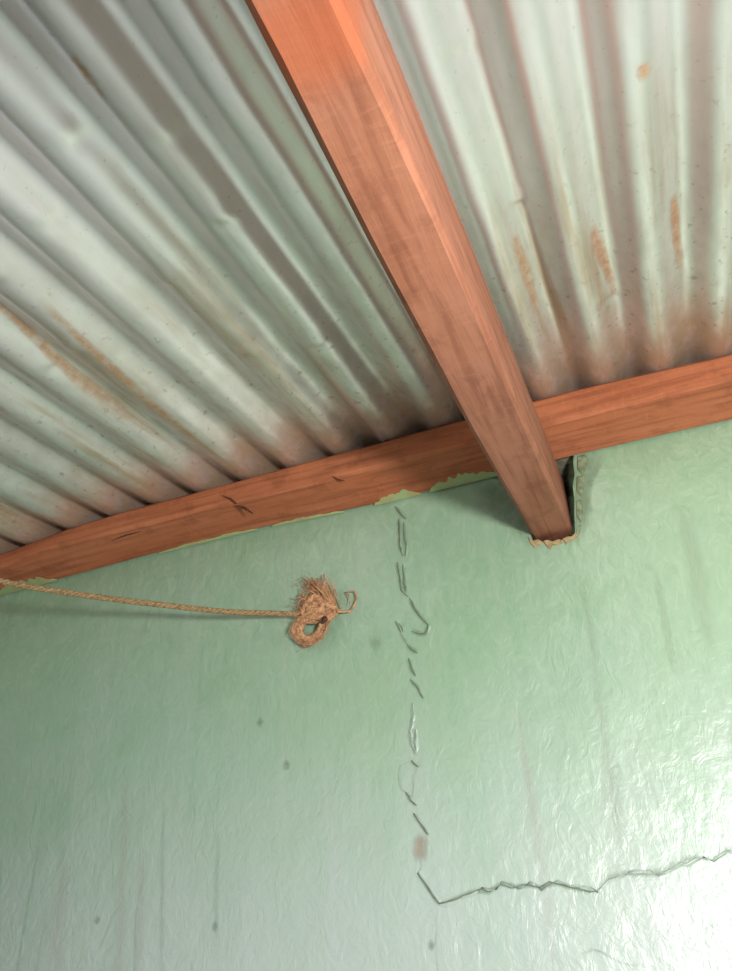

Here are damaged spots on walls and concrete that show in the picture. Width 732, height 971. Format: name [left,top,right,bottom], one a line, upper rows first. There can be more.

spalling [527,454,589,550]
crack [395,505,431,835]
crack [417,849,732,907]